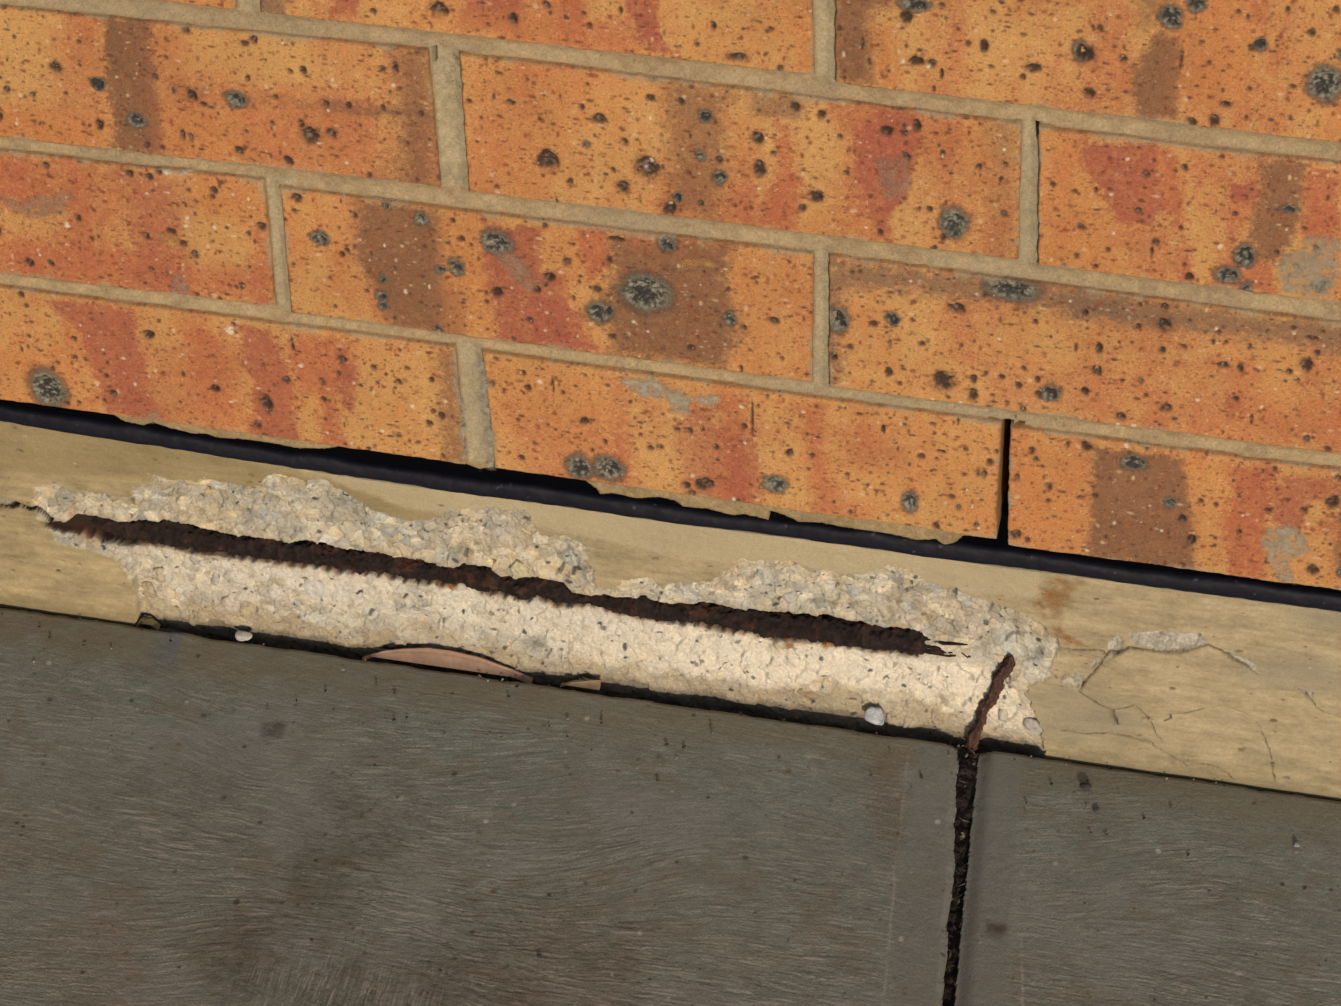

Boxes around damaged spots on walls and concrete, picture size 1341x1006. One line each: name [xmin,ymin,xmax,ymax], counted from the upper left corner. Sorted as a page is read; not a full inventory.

spalling [32,473,1062,759]
crack [1061,631,1261,777]
crack [1257,722,1276,781]
crack [1298,688,1339,716]